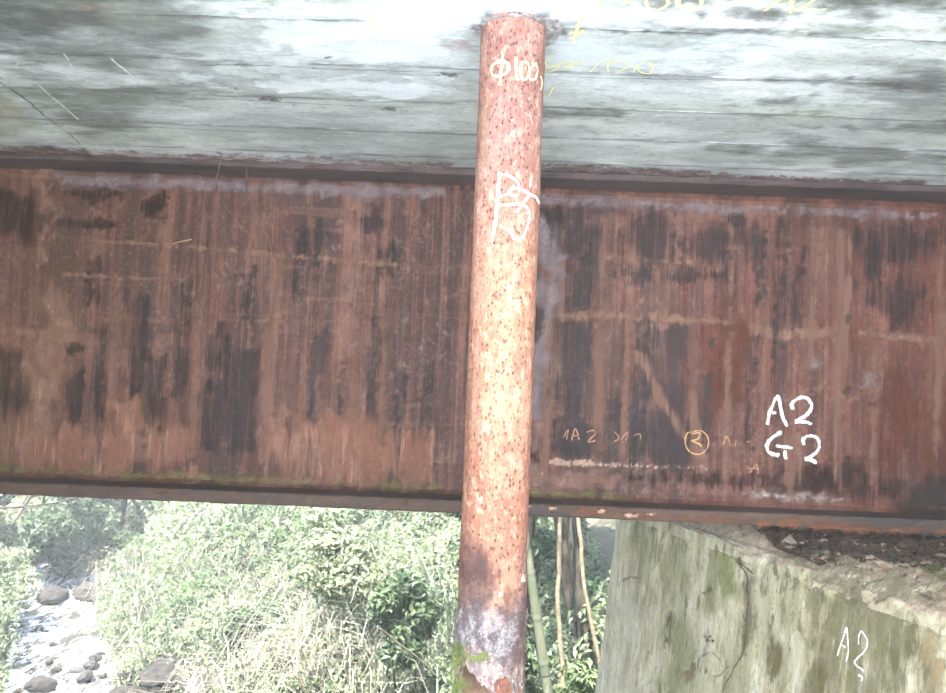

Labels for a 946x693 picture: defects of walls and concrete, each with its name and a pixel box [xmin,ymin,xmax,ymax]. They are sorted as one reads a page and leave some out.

damp [0,0,204,68]
damp [251,0,490,100]
damp [539,0,784,72]
damp [843,0,939,18]
damp [32,62,215,135]
damp [796,143,903,163]
corrosion [0,185,436,492]
corrosion [530,204,942,503]
corrosion [932,258,946,455]
corrosion [459,547,490,603]
damp [767,579,927,693]
corrosion [494,677,513,693]